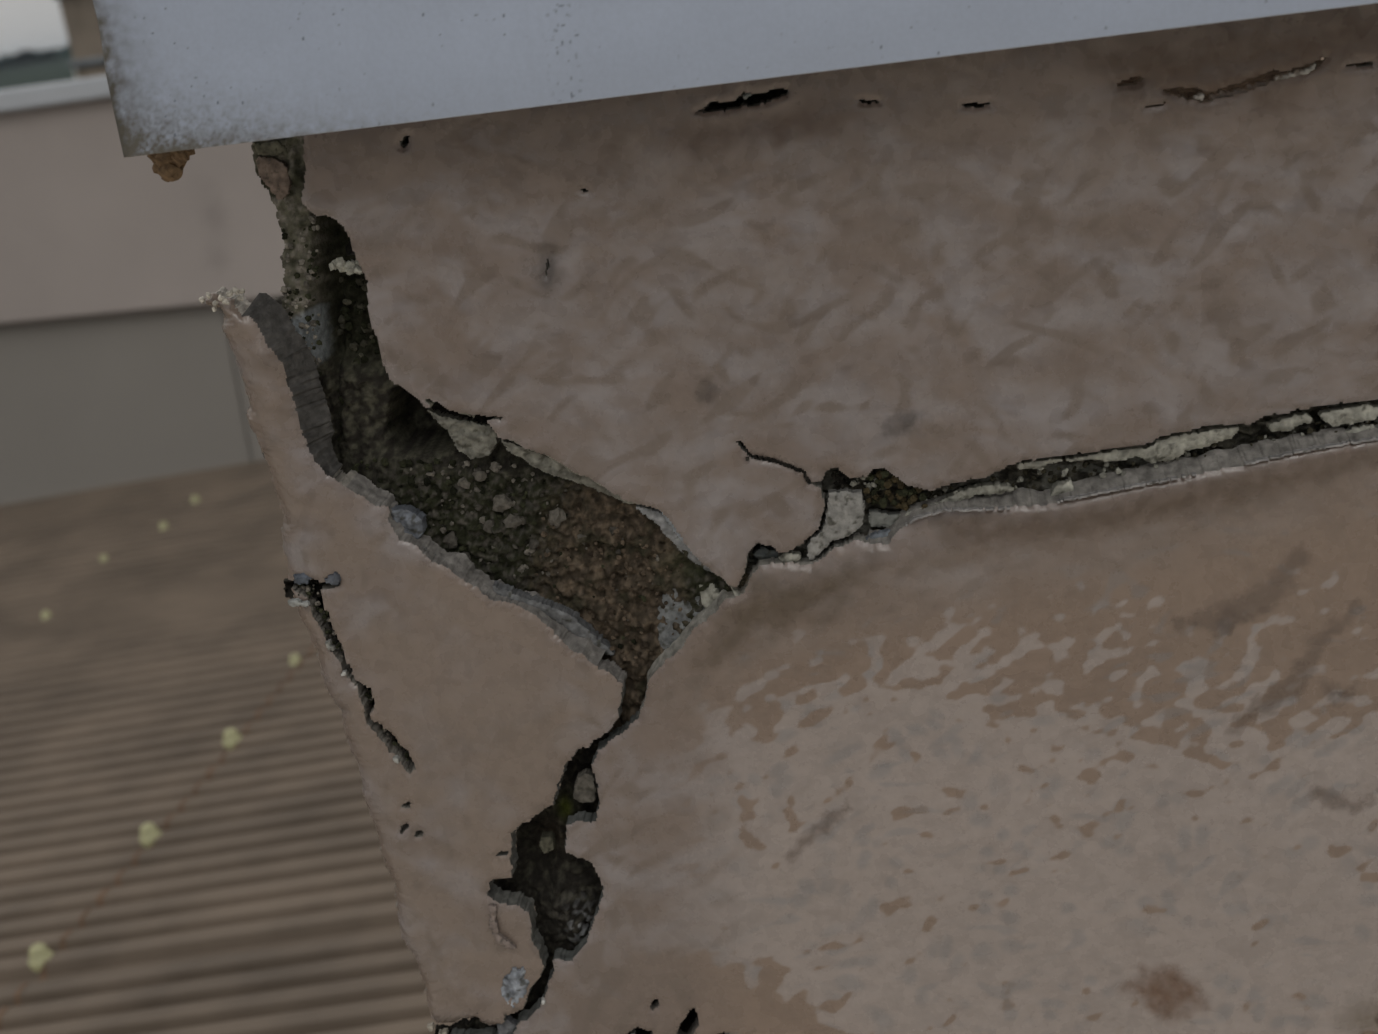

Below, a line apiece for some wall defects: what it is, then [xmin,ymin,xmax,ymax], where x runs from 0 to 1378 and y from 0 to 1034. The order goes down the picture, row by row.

crack [746,400,1378,564]
crack [284,571,415,765]
spalling [199,136,756,1026]